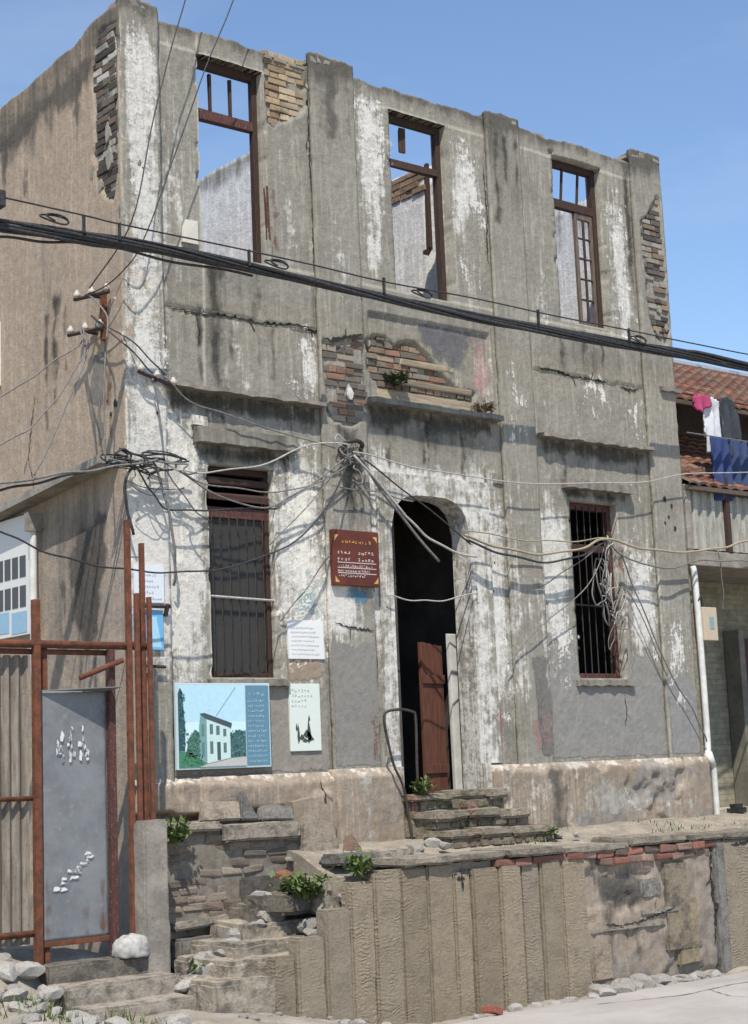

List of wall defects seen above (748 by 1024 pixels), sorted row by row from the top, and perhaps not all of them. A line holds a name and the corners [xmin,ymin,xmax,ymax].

damp [0,59,91,184]
flaking render [90,21,159,199]
damp [316,70,337,138]
peeling [354,97,426,263]
damp [494,132,517,192]
flaking render [604,200,670,342]
crack [164,305,364,345]
flaking render [286,324,471,423]
crack [535,366,639,394]
peeling [621,528,688,709]
damp [590,775,645,814]
crack [607,903,675,937]